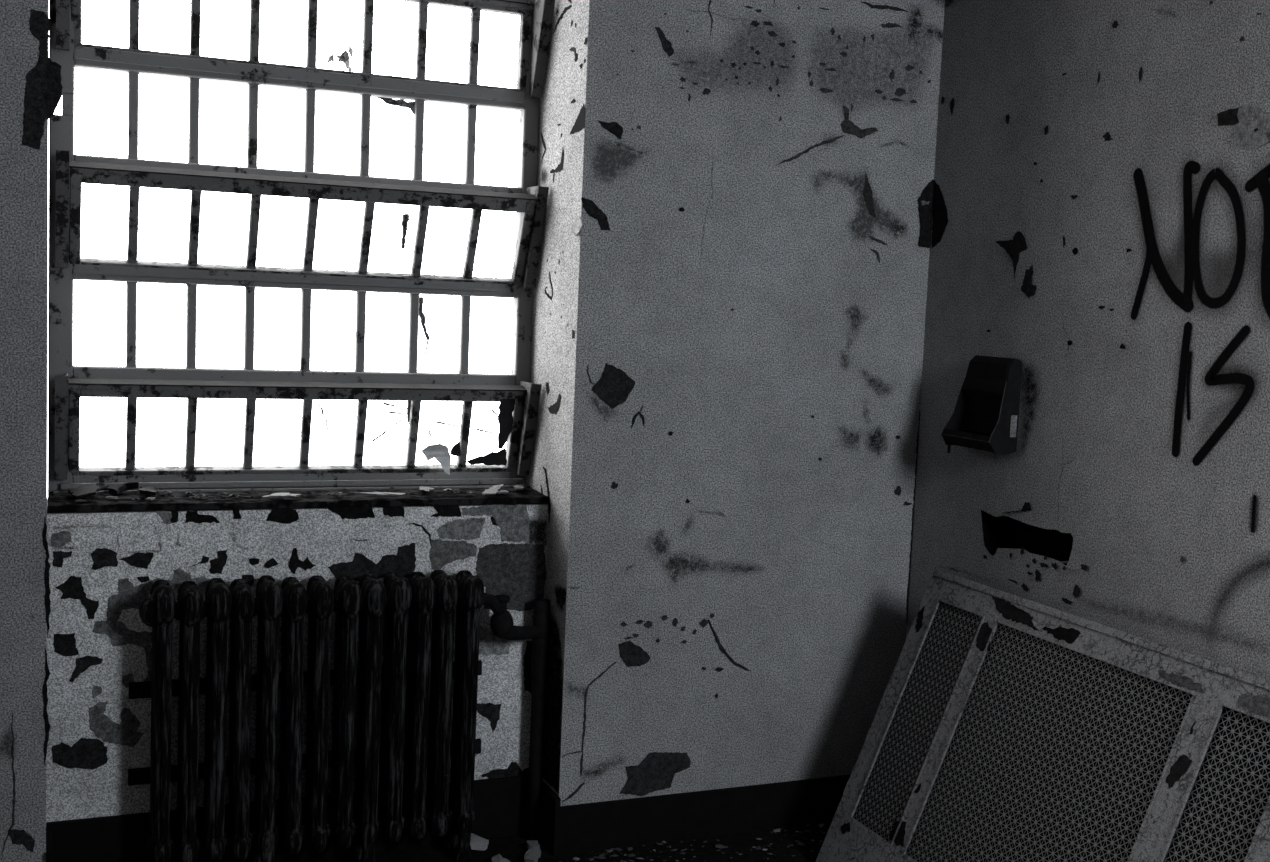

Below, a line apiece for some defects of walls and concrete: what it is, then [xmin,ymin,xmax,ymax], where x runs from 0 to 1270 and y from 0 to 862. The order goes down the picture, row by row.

peeling [22,9,63,150]
crack [777,105,904,165]
spalling [917,179,948,248]
peeling [587,363,635,418]
peeling [145,497,241,524]
peeling [242,484,530,586]
spalling [981,502,1088,592]
peeling [51,530,228,688]
peeling [992,596,1080,644]
peeling [51,685,144,769]
peeling [477,703,501,733]
peeling [619,752,691,796]